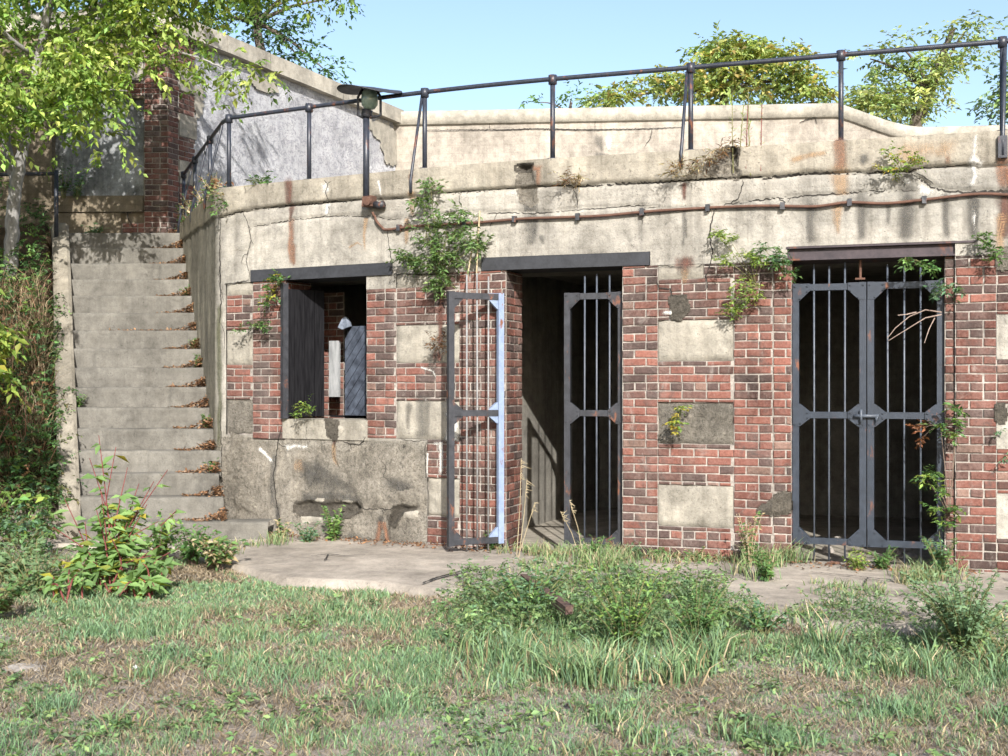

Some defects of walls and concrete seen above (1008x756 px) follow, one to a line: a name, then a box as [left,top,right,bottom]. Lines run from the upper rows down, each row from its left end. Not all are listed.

rust [286,180,295,264]
crack [447,164,1008,297]
rust [835,141,845,192]
rust [998,158,1008,246]
crack [270,426,307,524]
spalling [293,498,363,524]
crack [308,438,392,489]
spalling [388,503,419,529]